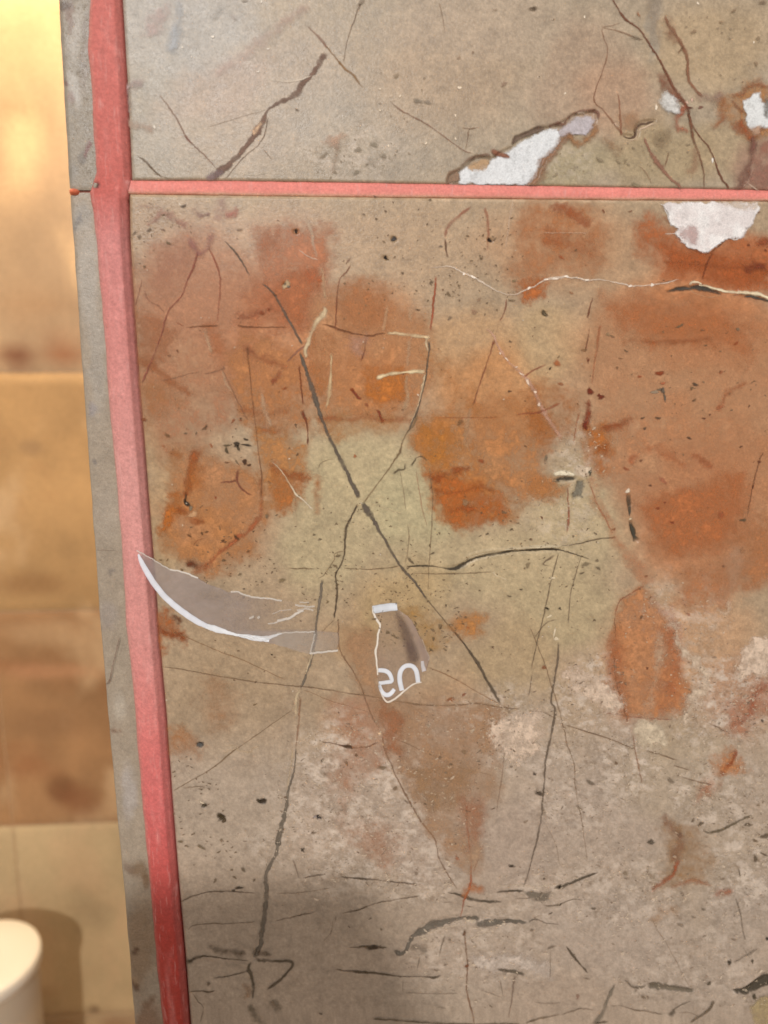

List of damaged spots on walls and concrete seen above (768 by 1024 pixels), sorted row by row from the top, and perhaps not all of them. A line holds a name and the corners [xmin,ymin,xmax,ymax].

crack [171,4,361,179]
spalling [441,109,600,185]
crack [593,0,729,189]
spalling [655,92,680,113]
spalling [743,93,768,134]
rust [638,216,768,297]
spalling [663,201,760,254]
rust [246,230,431,440]
rust [160,429,305,576]
rust [411,413,511,526]
crack [143,240,768,1024]
peeling [243,585,768,1024]